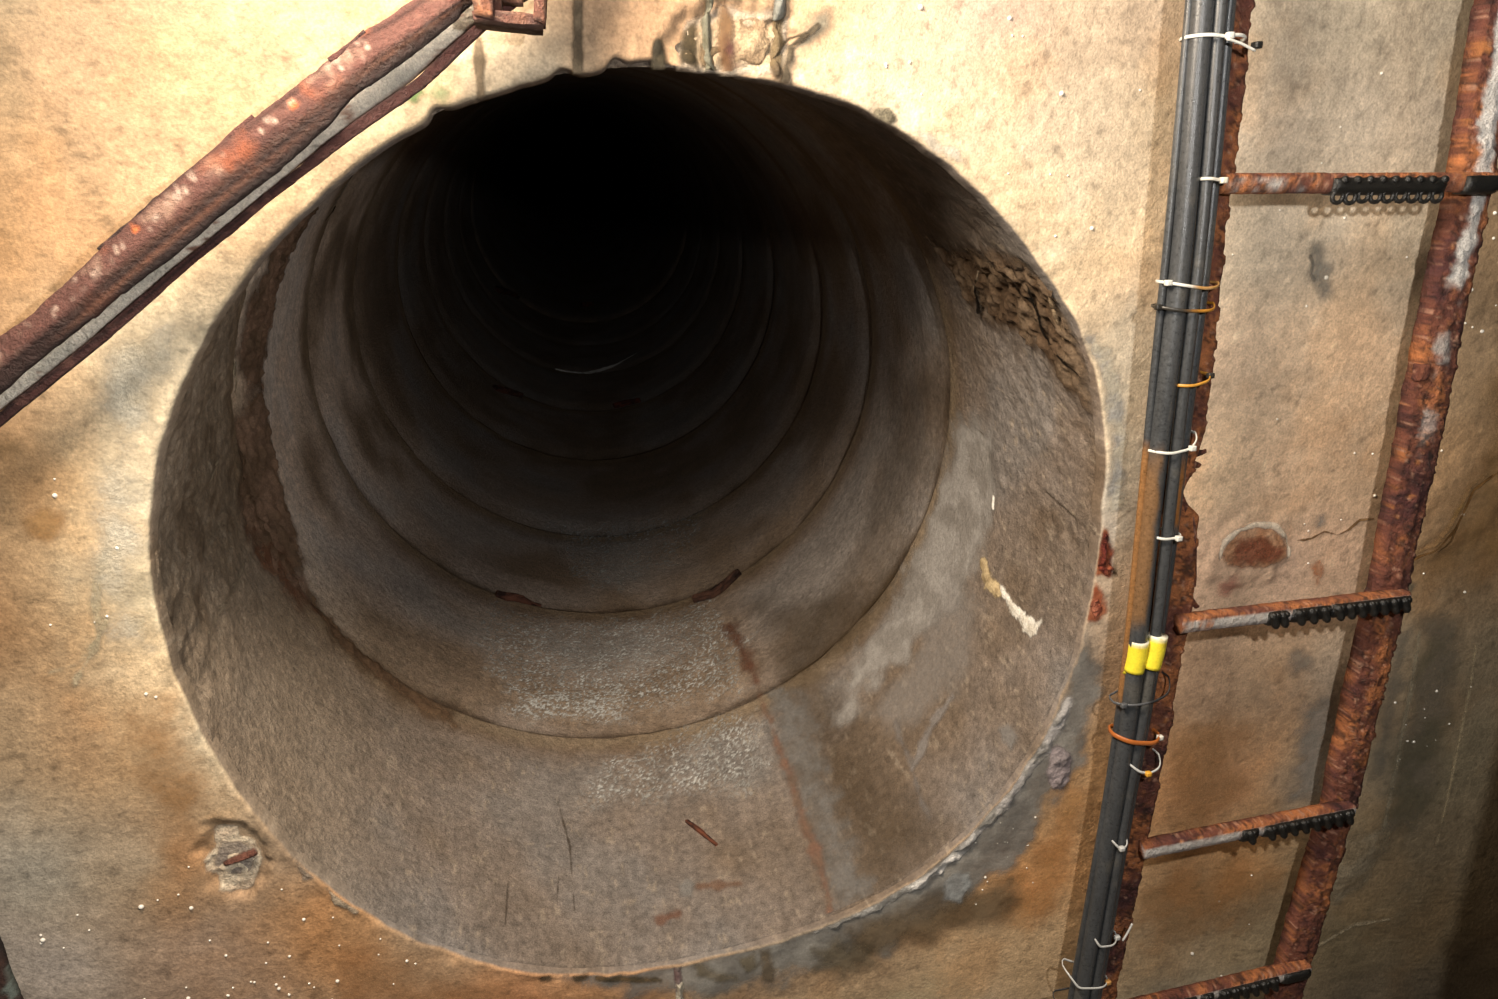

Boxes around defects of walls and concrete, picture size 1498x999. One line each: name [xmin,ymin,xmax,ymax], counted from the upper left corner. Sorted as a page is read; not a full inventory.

spalling [930,243,1090,412]
water stain [839,418,1042,723]
corrosion [1088,529,1114,621]
crack [1414,473,1498,561]
spalling [204,824,262,891]
water stain [574,650,1101,999]